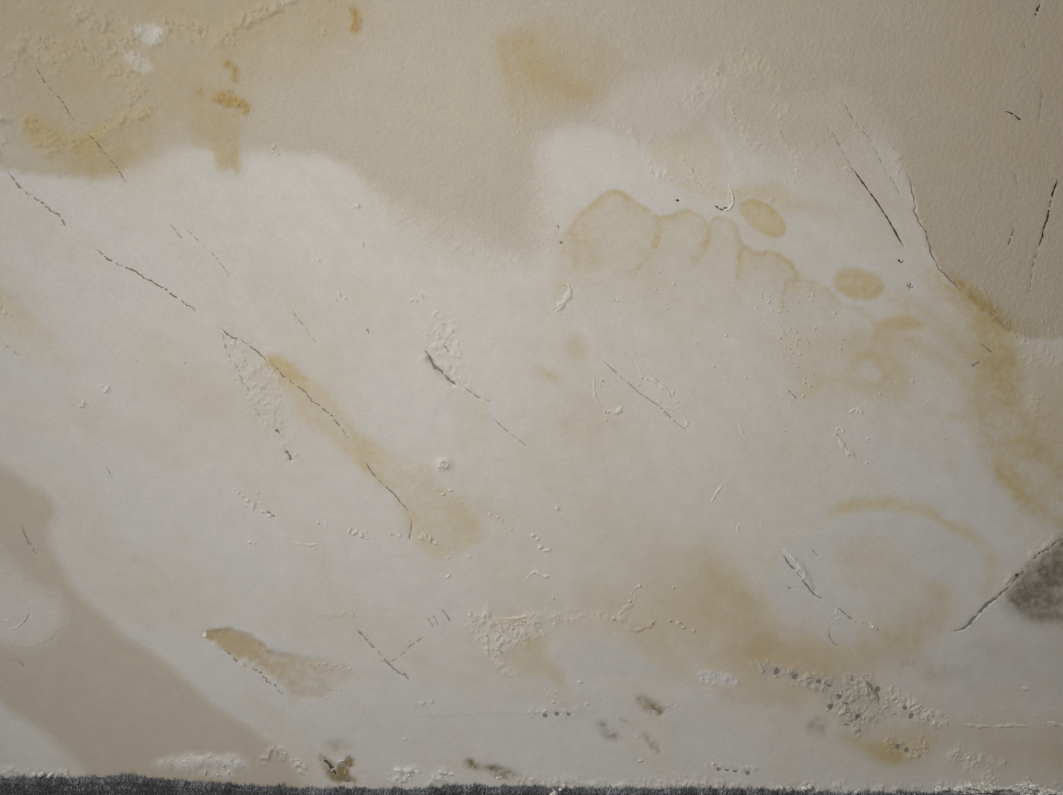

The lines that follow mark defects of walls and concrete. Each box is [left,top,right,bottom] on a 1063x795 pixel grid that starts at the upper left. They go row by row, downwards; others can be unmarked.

crack [0,167,195,311]
flaking render [539,56,938,328]
crack [222,329,350,441]
water stain [548,186,1063,535]
water stain [272,350,492,565]
crack [364,461,412,539]
water stain [505,531,963,735]
water stain [822,492,1063,633]
crack [955,539,1061,631]
flaking render [0,695,92,779]
flaking render [382,764,463,790]
flaking render [510,770,1063,795]